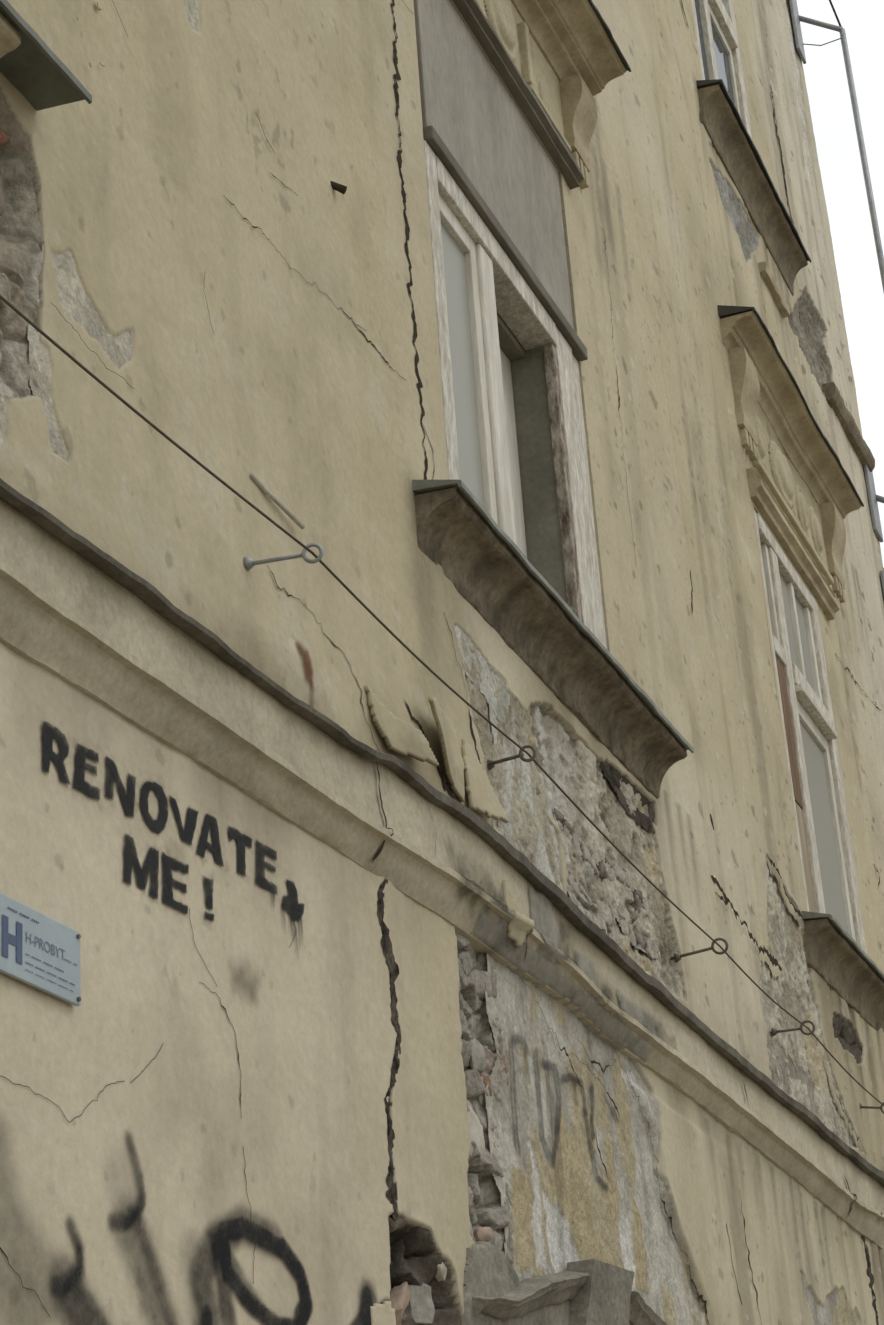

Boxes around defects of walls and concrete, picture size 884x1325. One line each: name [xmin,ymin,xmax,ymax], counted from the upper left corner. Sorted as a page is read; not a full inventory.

spalling [0,92,133,462]
crack [223,0,435,480]
spalling [710,162,758,261]
spalling [788,288,831,406]
crack [0,1044,163,1123]
crack [267,565,401,1221]
spalling [380,1214,462,1325]
peeling [455,625,702,1325]
crack [712,875,782,978]
crack [823,1056,883,1325]